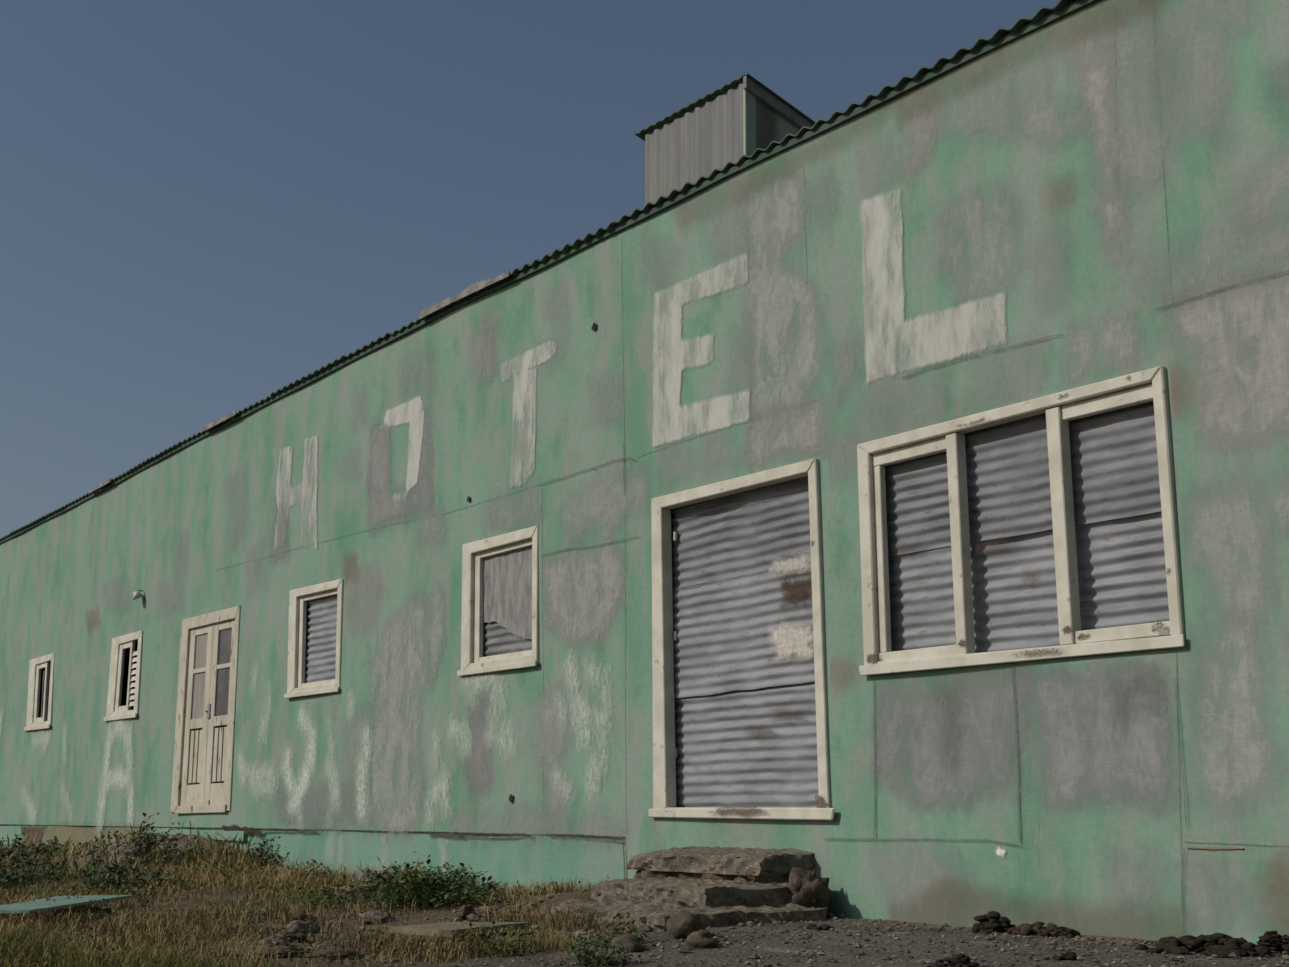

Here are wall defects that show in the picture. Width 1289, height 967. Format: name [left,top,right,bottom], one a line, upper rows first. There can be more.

peeling [745,172,827,466]
peeling [1171,275,1289,447]
peeling [544,539,624,646]
peeling [771,556,811,574]
peeling [771,624,813,659]
rust [781,576,812,603]
peeling [559,662,607,791]
peeling [1021,664,1171,813]